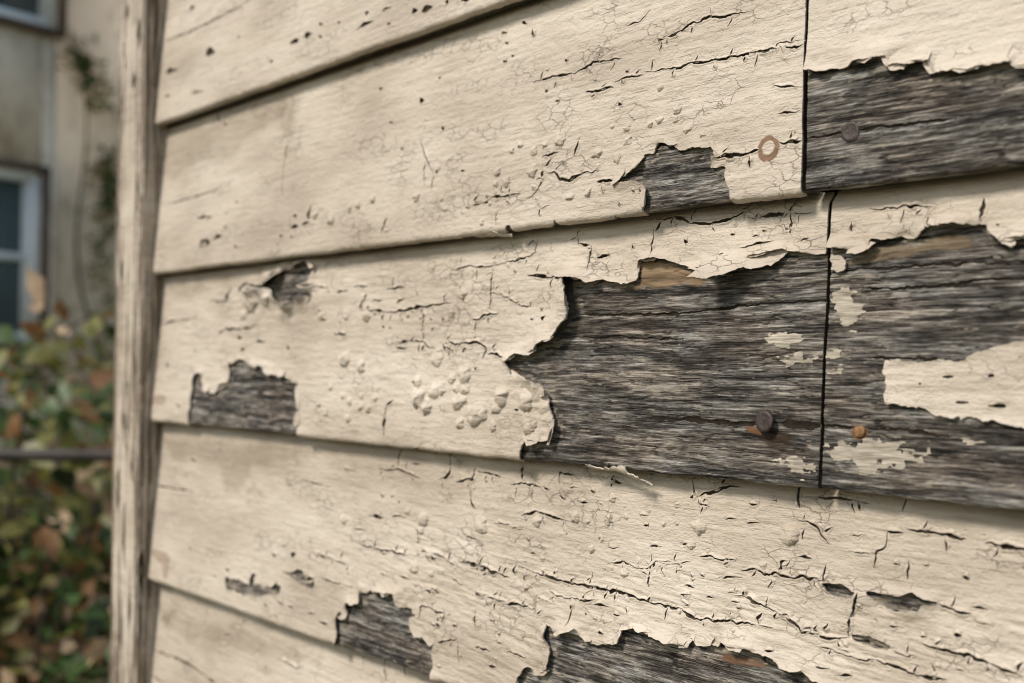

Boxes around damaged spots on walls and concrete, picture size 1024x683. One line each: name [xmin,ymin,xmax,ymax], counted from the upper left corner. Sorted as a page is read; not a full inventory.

crack [533,6,805,169]
peeling [609,130,747,216]
crack [648,198,814,256]
rust [758,135,780,161]
crack [868,201,934,227]
peeling [803,38,1024,192]
peeling [177,334,306,438]
peeling [500,208,1024,511]
crack [690,476,741,514]
peeling [307,527,457,682]
crack [305,487,1024,683]
peeling [475,600,859,683]